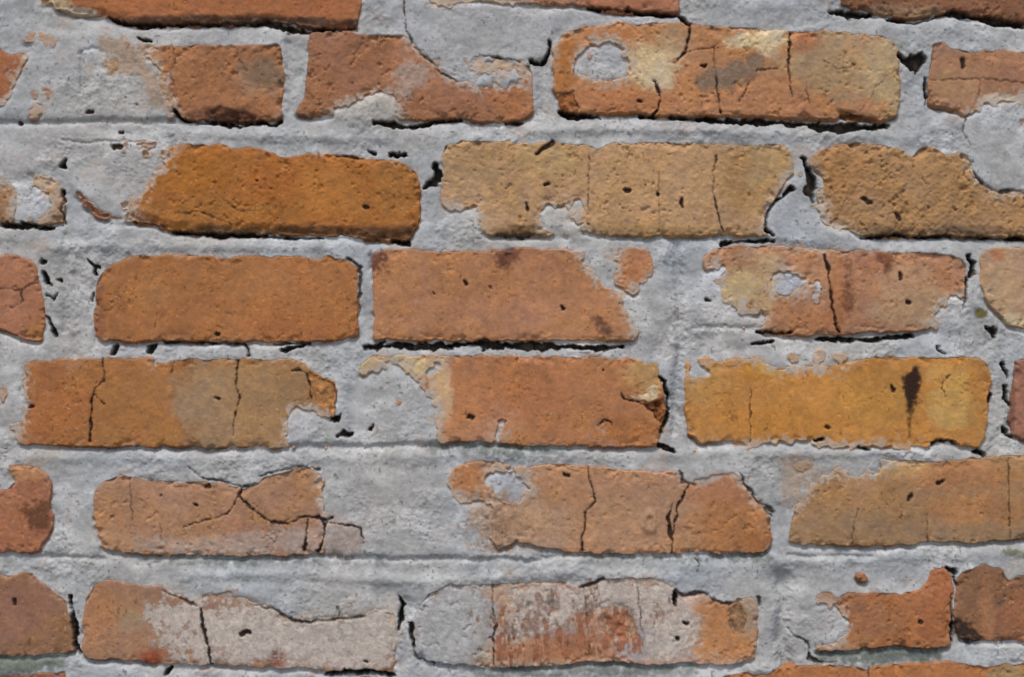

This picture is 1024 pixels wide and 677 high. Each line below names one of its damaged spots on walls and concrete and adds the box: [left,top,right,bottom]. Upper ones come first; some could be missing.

crack [677,24,691,61]
crack [785,33,793,93]
crack [650,81,661,120]
crack [823,254,840,333]
crack [89,358,105,442]
crack [190,490,364,552]
crack [581,471,596,551]
crack [666,484,699,572]
crack [200,608,212,663]